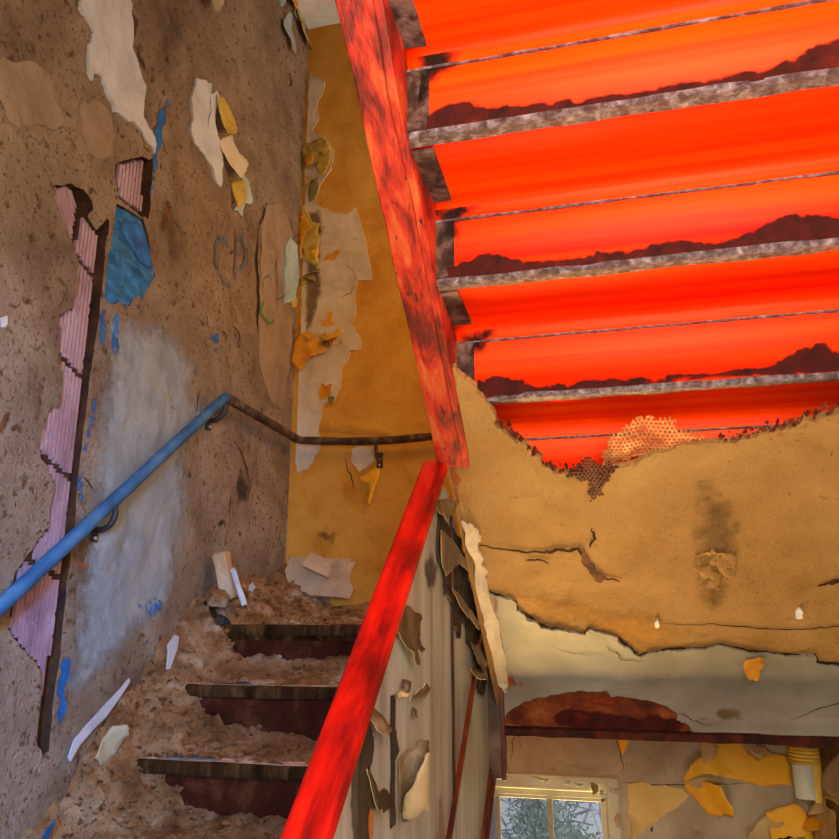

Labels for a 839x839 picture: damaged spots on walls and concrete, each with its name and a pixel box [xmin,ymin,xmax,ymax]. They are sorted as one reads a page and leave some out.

peeling [78,0,157,153]
spalling [104,159,155,306]
peeling [282,72,373,473]
spalling [13,186,98,583]
spalling [8,560,62,746]
peeling [396,605,425,666]
crack [479,528,620,582]
peeling [436,499,839,737]
crack [660,622,839,630]
peeling [358,679,431,839]
peeling [615,743,793,839]
peeling [747,752,839,839]